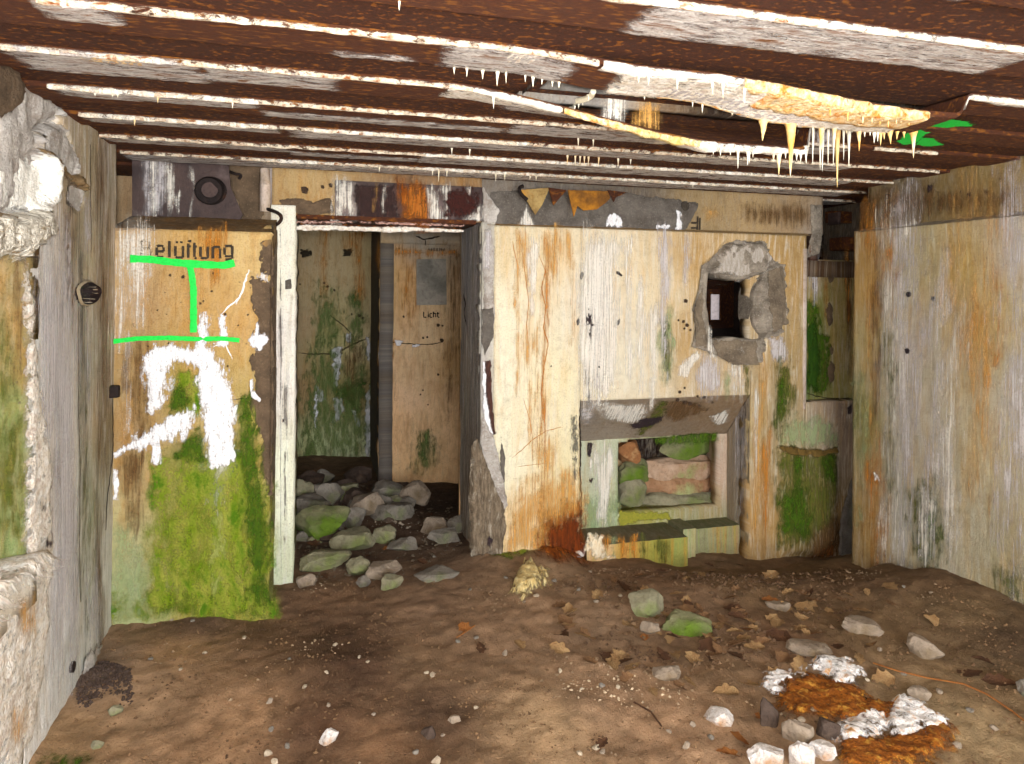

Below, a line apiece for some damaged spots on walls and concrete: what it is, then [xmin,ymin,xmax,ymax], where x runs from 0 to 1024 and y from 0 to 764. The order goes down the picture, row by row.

spalling [0,66,90,262]
water stain [0,230,100,764]
rust [353,176,429,231]
rust [444,185,480,219]
water stain [0,0,1024,566]
rust [509,229,593,565]
spalling [468,187,698,557]
spalling [678,240,790,365]